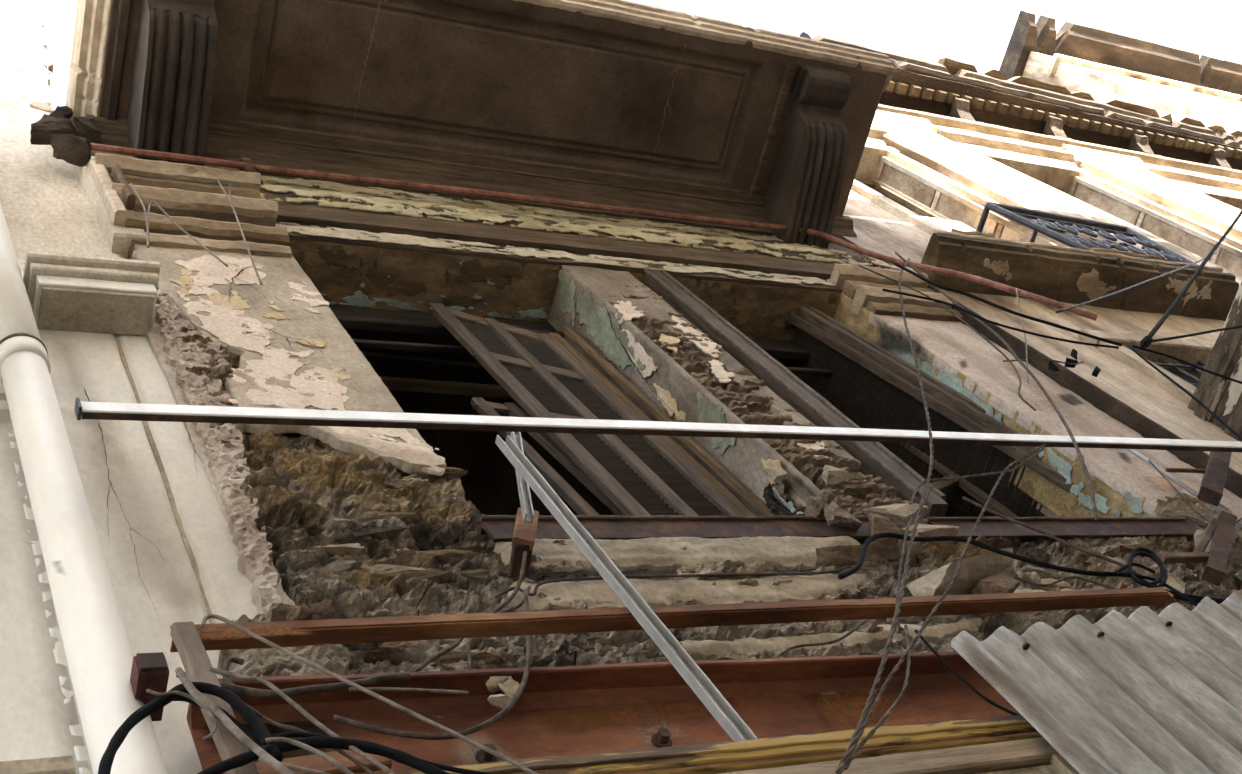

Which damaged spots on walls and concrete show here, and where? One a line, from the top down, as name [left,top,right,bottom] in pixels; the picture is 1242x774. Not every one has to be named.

peeling [257,176,912,271]
peeling [983,258,1013,281]
peeling [1076,268,1117,300]
peeling [1165,276,1212,307]
spalling [155,222,909,541]
peeling [877,335,1003,424]
crack [84,389,172,615]
spalling [191,422,548,619]
spalling [342,633,582,674]
corrosion [541,700,710,731]
corrosion [808,690,893,725]